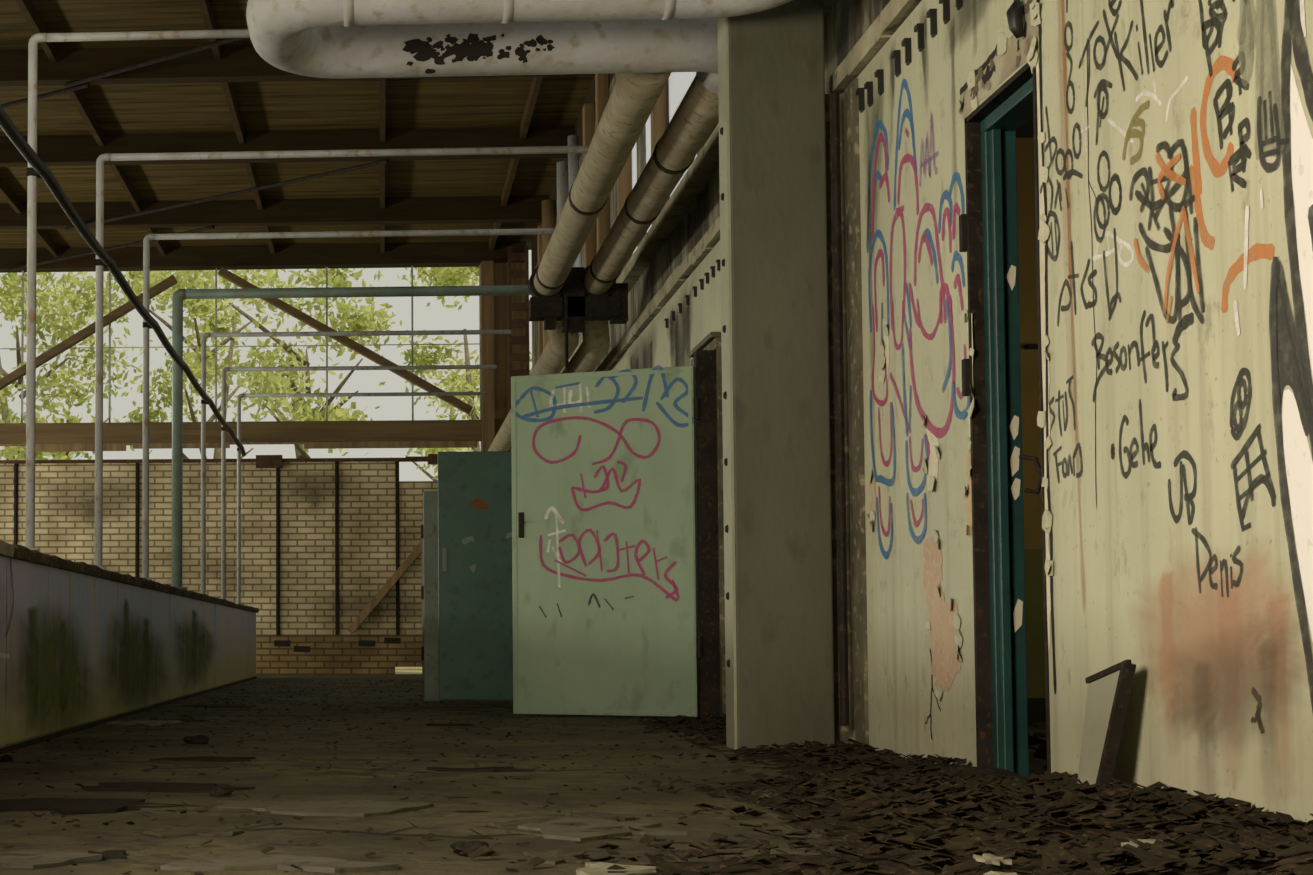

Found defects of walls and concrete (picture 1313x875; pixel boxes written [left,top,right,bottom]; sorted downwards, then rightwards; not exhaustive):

peeling [402,33,555,74]
peeling [923,529,963,701]